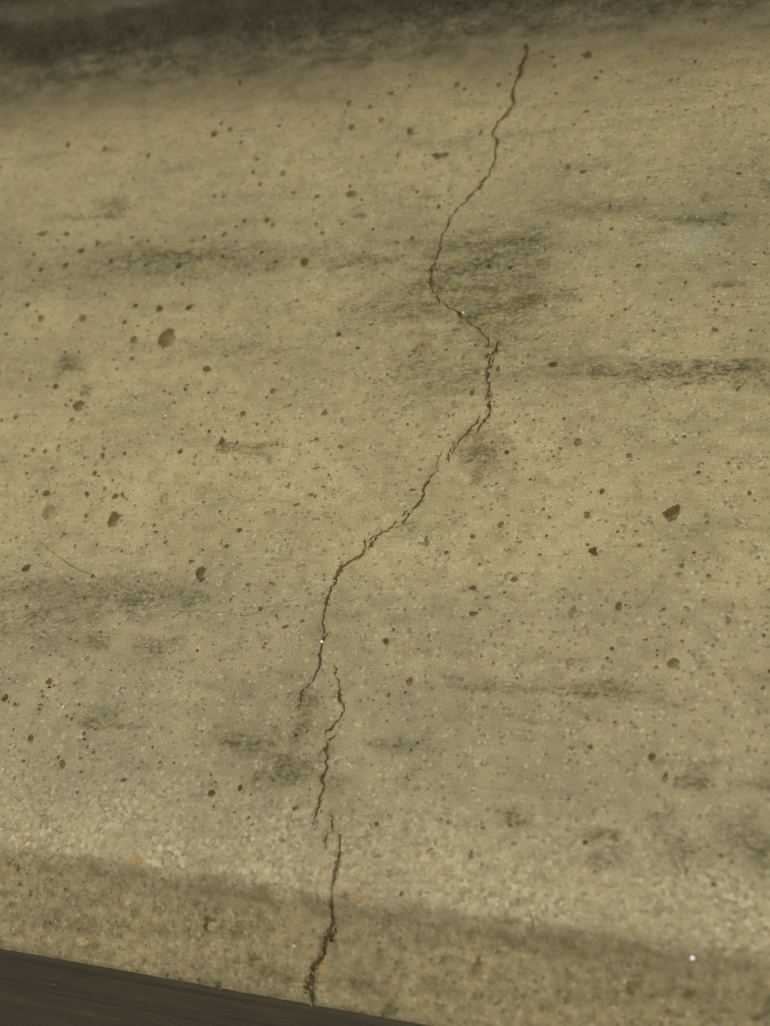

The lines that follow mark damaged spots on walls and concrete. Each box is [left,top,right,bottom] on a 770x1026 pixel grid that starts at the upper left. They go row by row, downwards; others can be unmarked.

crack [154,42,531,1006]